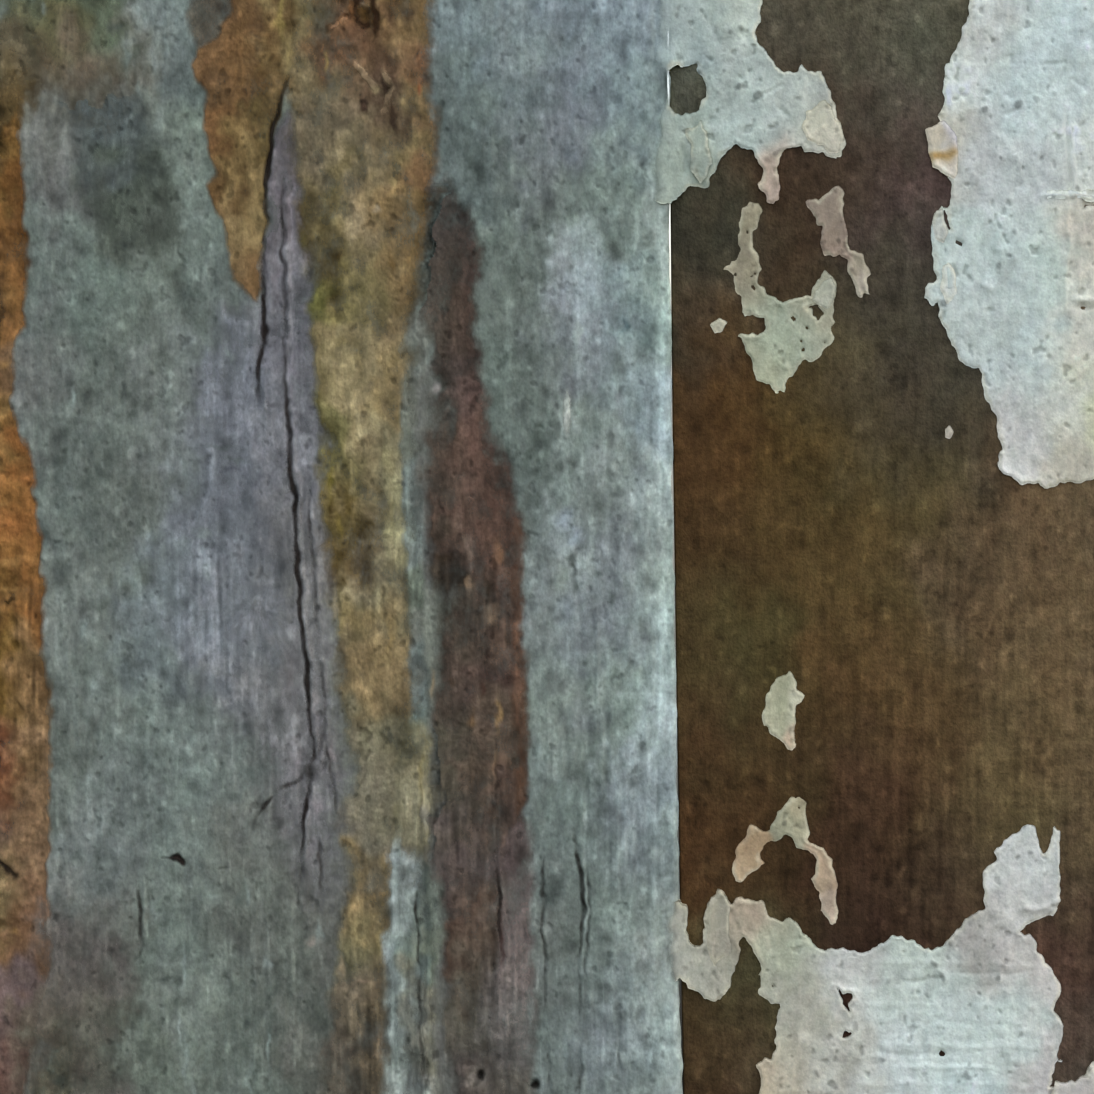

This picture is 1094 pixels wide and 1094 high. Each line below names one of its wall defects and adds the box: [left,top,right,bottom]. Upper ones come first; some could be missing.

crack [256,294,286,381]
crack [263,96,282,212]
peeling [654,0,846,393]
peeling [806,186,871,298]
peeling [924,0,1094,489]
corrosion [0,24,139,1094]
crack [262,781,321,870]
crack [285,399,330,767]
corrosion [187,0,535,1094]
peeling [762,671,805,750]
peeling [732,797,838,925]
peeling [669,824,1094,1094]